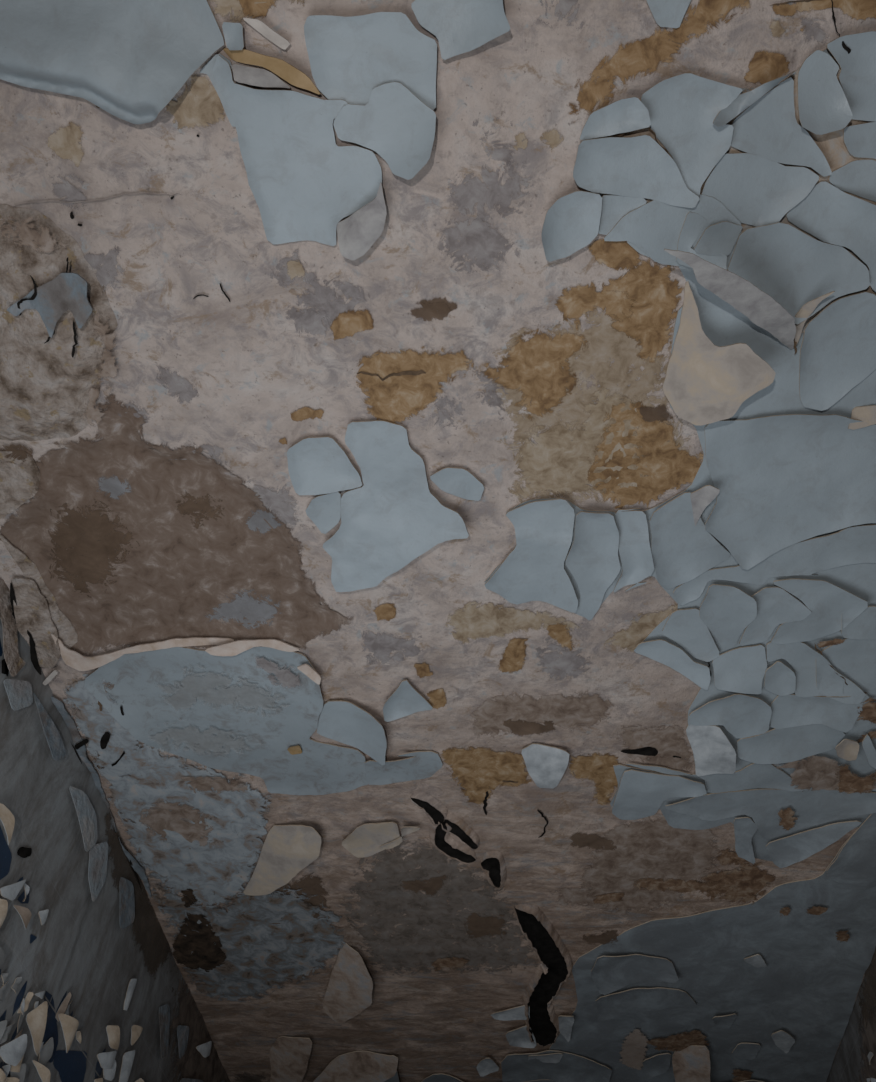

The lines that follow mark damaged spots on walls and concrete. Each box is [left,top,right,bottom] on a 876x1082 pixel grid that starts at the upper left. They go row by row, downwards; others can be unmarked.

peeling [0,0,510,260]
water stain [439,118,533,276]
rust [569,0,751,120]
rust [744,51,790,84]
water stain [270,250,370,338]
rust [330,310,374,340]
rust [356,239,703,509]
water stain [248,476,298,525]
peeling [287,420,484,592]
peeling [476,31,876,1082]
peeling [0,393,443,1024]
crack [411,780,573,1047]